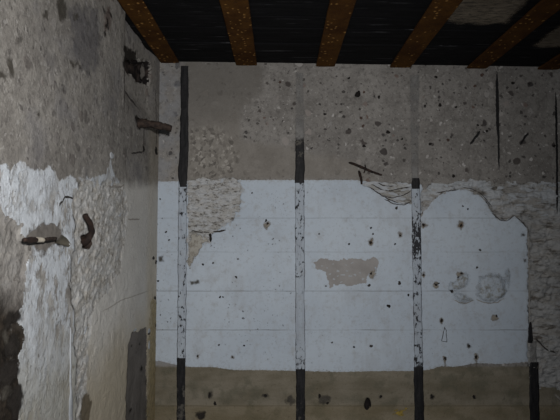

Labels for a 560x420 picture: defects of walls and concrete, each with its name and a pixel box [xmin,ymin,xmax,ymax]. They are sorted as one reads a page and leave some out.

hole [123,46,152,117]
rust [135,115,172,132]
spalling [186,177,253,269]
peeling [362,181,412,210]
flaking render [0,207,33,420]
spalling [69,179,129,420]
peeling [314,257,379,288]
spalling [420,178,560,390]